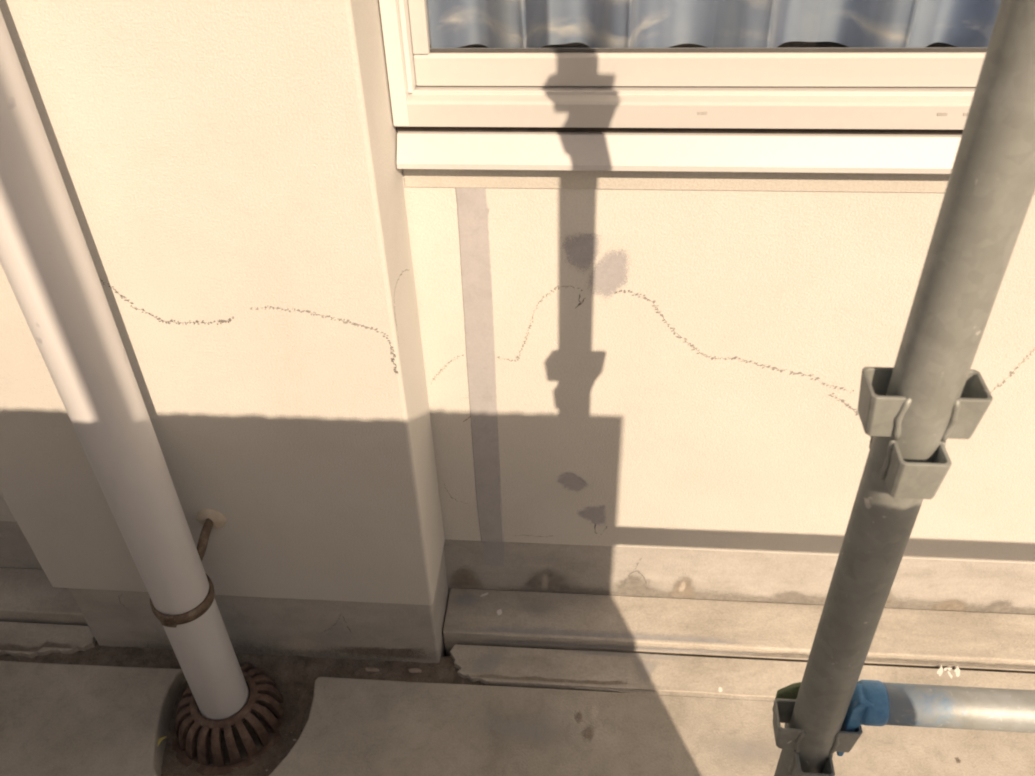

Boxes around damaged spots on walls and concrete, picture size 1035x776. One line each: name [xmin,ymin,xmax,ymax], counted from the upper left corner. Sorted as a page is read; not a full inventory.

crack [100,269,409,374]
crack [614,290,858,415]